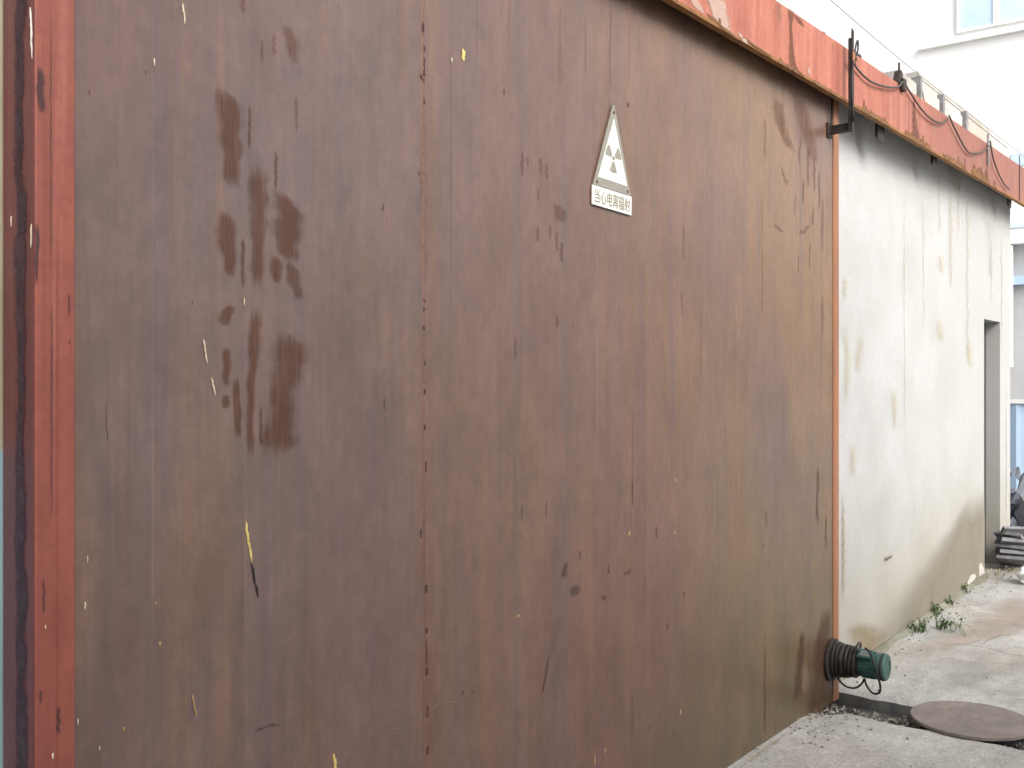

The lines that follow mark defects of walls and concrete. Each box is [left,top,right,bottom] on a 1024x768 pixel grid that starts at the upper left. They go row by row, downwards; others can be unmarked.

peeling [691,0,748,44]
corrosion [221,176,301,295]
corrosion [223,318,302,444]